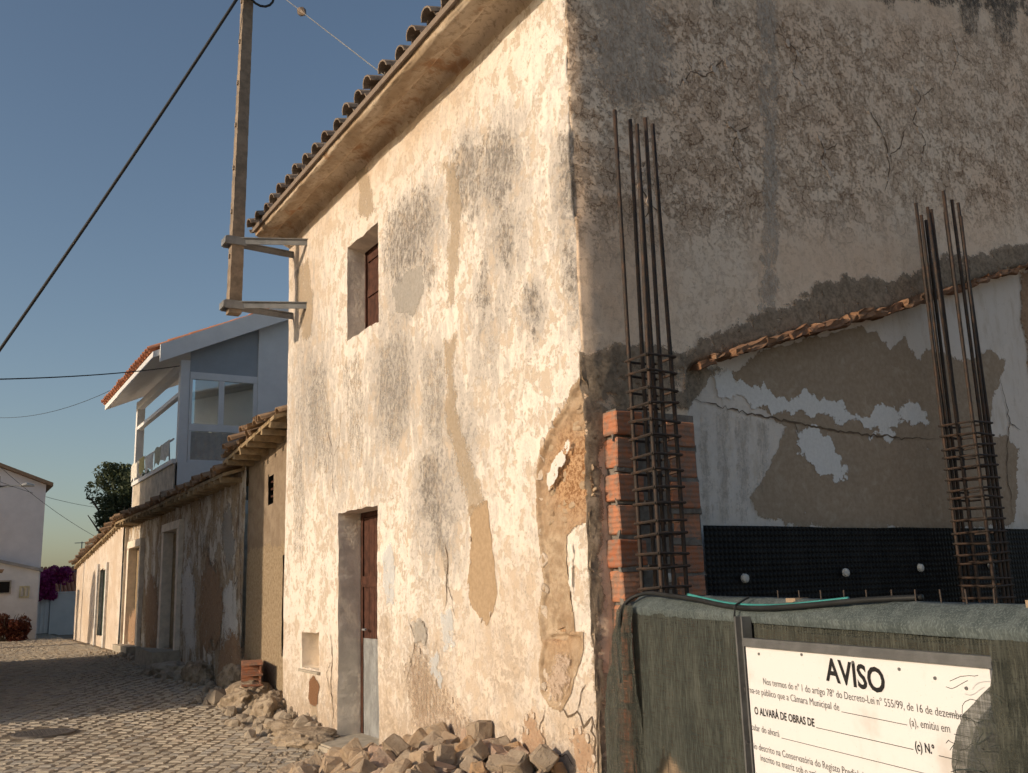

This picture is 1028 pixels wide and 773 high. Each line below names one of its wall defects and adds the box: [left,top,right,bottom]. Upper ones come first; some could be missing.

water stain [914,0,1028,47]
water stain [444,162,462,307]
crack [695,399,929,440]
peeling [712,325,1020,528]
flaking render [198,558,247,675]
flaking render [467,501,497,626]
flaking render [534,378,597,712]